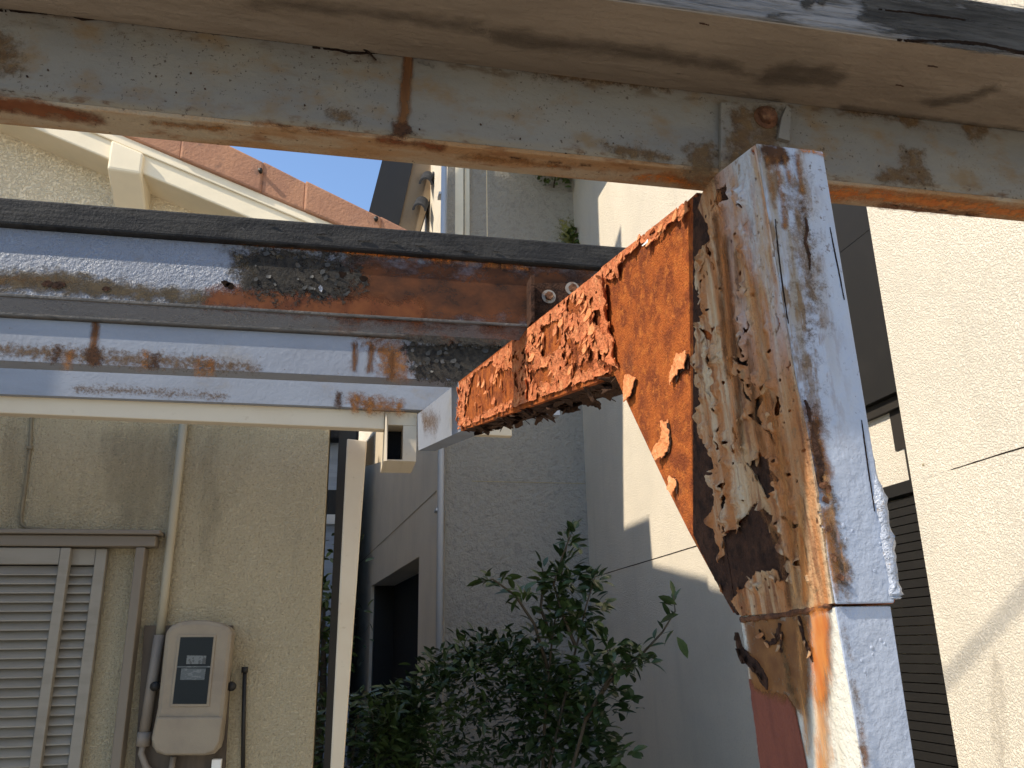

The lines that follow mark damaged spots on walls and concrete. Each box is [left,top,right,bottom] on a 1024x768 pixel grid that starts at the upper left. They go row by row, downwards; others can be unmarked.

corrosion [0,90,103,124]
corrosion [151,122,226,131]
corrosion [376,57,446,151]
spalling [715,185,729,206]
corrosion [829,146,1024,218]
corrosion [0,245,598,381]
corrosion [606,104,852,600]
peeling [401,194,796,615]
corrosion [744,495,833,768]